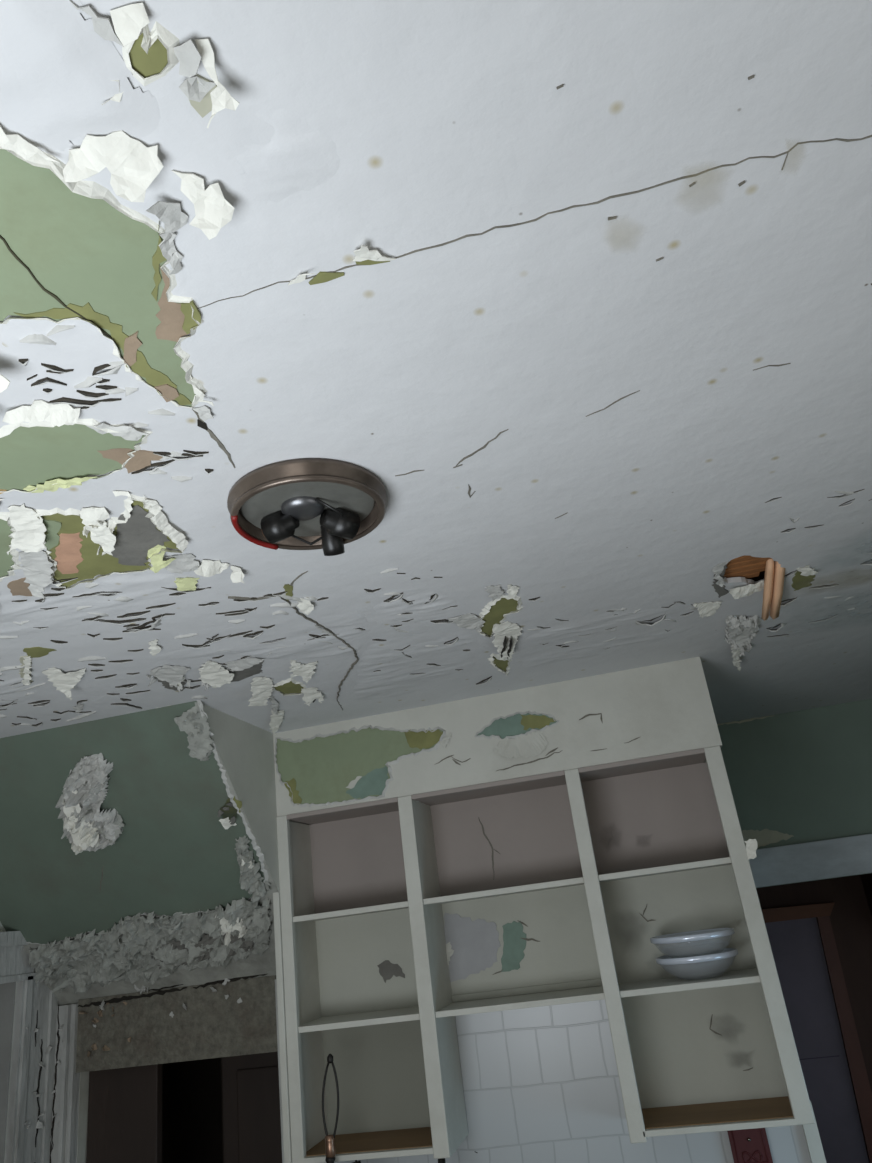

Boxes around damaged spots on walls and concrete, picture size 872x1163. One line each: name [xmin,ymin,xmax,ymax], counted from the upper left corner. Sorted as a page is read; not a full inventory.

peeling [69,0,239,128]
peeling [0,126,234,408]
crack [198,135,872,309]
peeling [0,400,245,599]
crack [228,571,359,710]
peeling [448,585,523,676]
peeling [693,560,764,671]
peeling [791,565,819,591]
peeling [475,711,561,771]
peeling [0,639,471,994]
crack [25,974,267,1163]